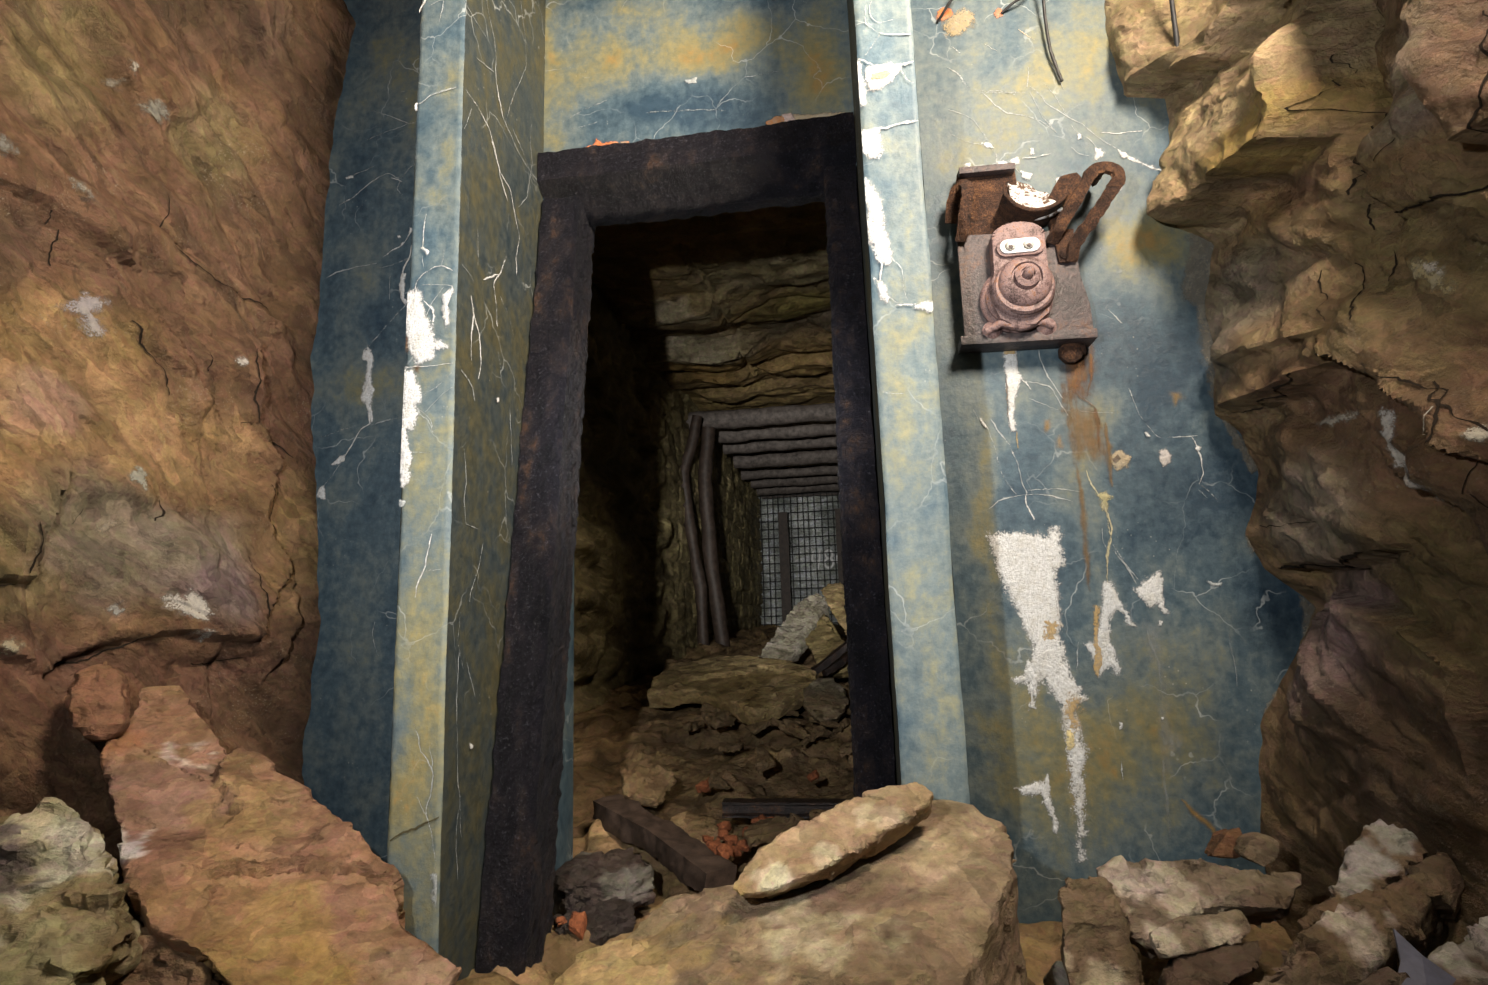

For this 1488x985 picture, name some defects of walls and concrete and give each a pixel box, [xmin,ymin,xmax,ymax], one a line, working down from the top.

rust [1063,348,1112,483]